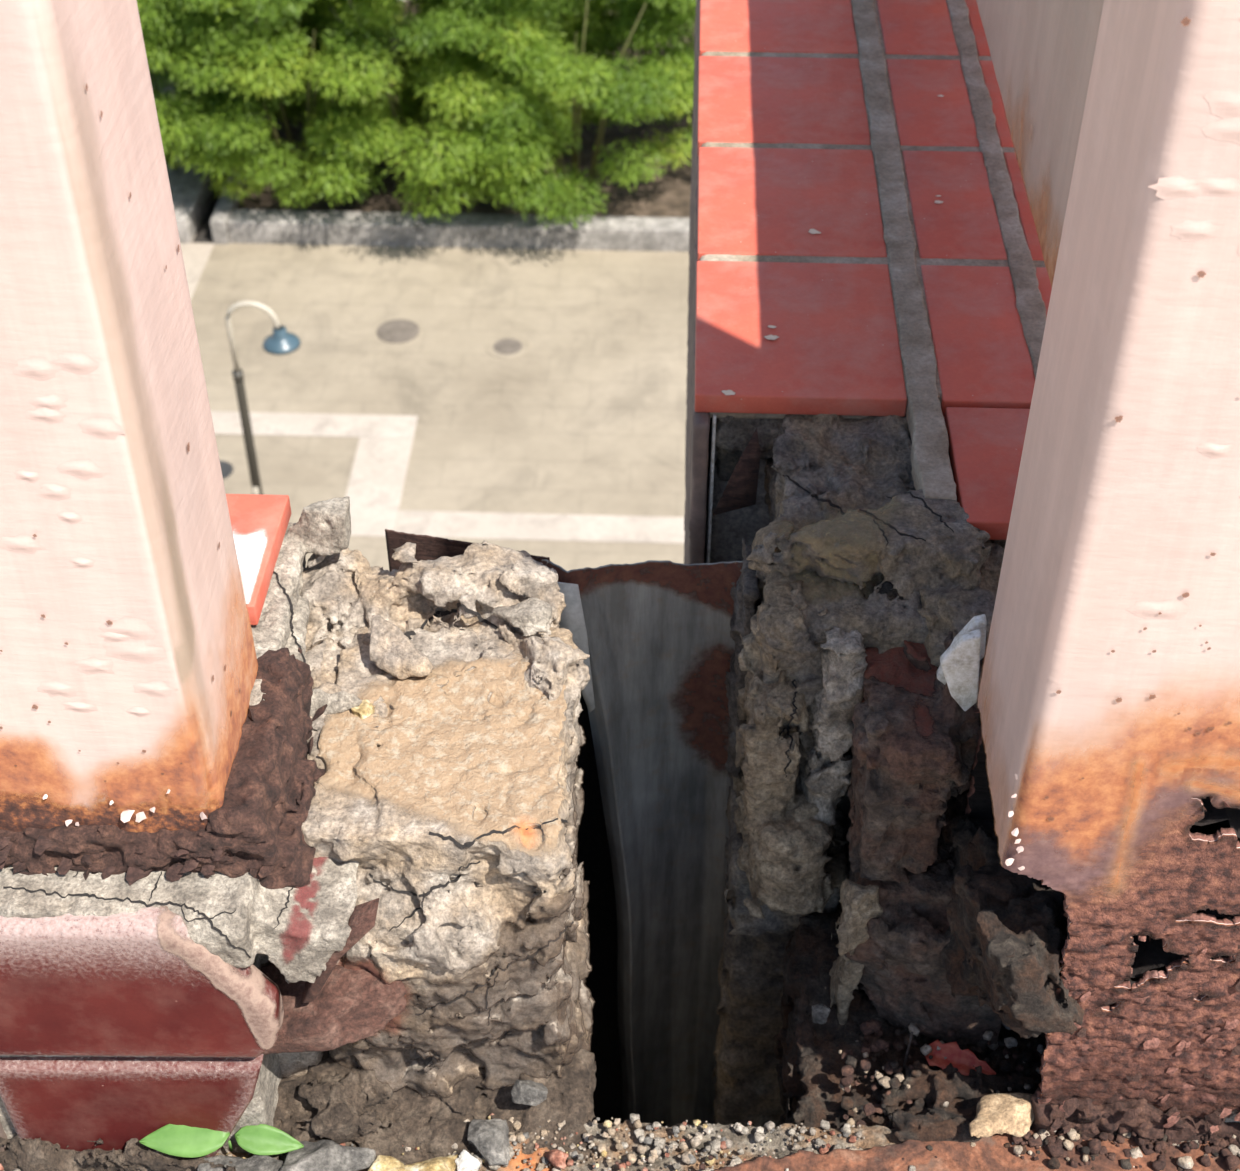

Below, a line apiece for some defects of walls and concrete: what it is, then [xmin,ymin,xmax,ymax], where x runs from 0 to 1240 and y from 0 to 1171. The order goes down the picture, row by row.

crack [783,475,954,546]
rust [540,561,743,617]
rust [0,597,328,889]
spalling [314,657,567,856]
rust [673,645,734,775]
spalling [863,614,987,711]
peeling [1005,774,1025,871]
crack [3,871,251,958]
crack [273,887,294,929]
crack [369,818,568,932]
rust [1003,695,1240,1147]